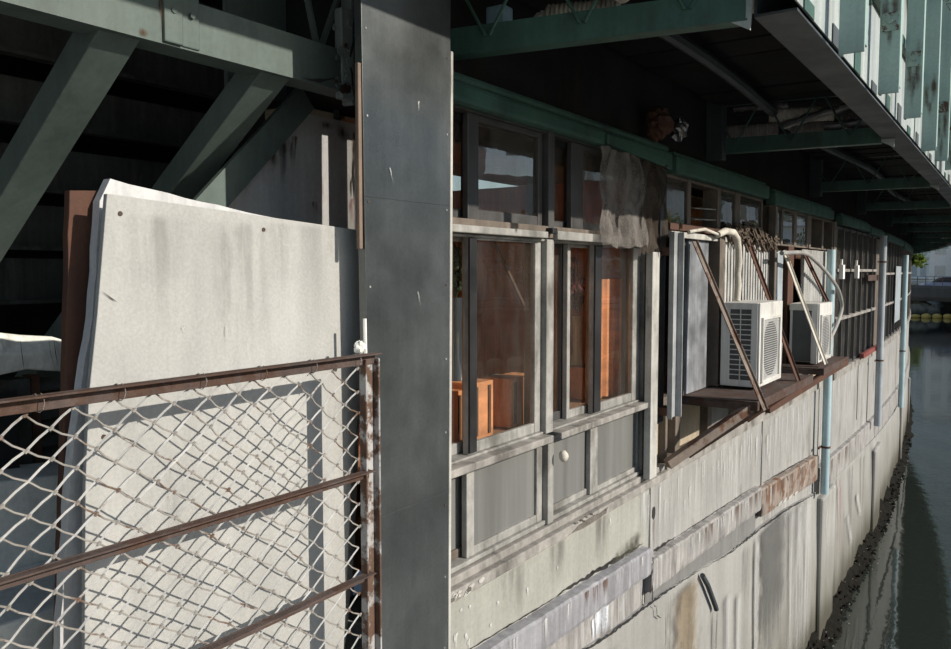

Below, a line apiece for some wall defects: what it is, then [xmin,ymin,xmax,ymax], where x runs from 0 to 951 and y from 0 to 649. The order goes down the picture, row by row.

corrosion [908,66,936,110]
damp [677,585,696,649]